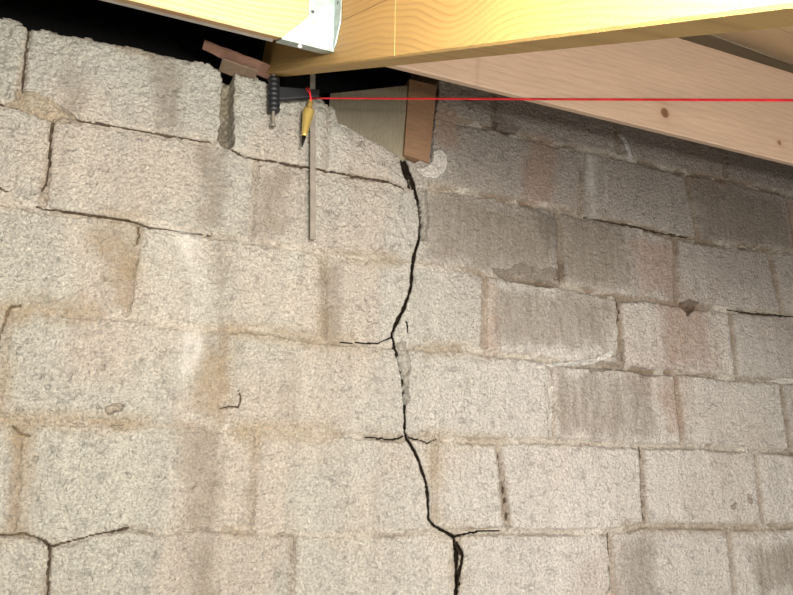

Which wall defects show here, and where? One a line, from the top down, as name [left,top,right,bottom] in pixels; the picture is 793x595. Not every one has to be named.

crack [0,30,30,110]
spalling [217,72,235,150]
crack [36,119,211,244]
crack [231,149,507,595]
crack [0,527,129,595]